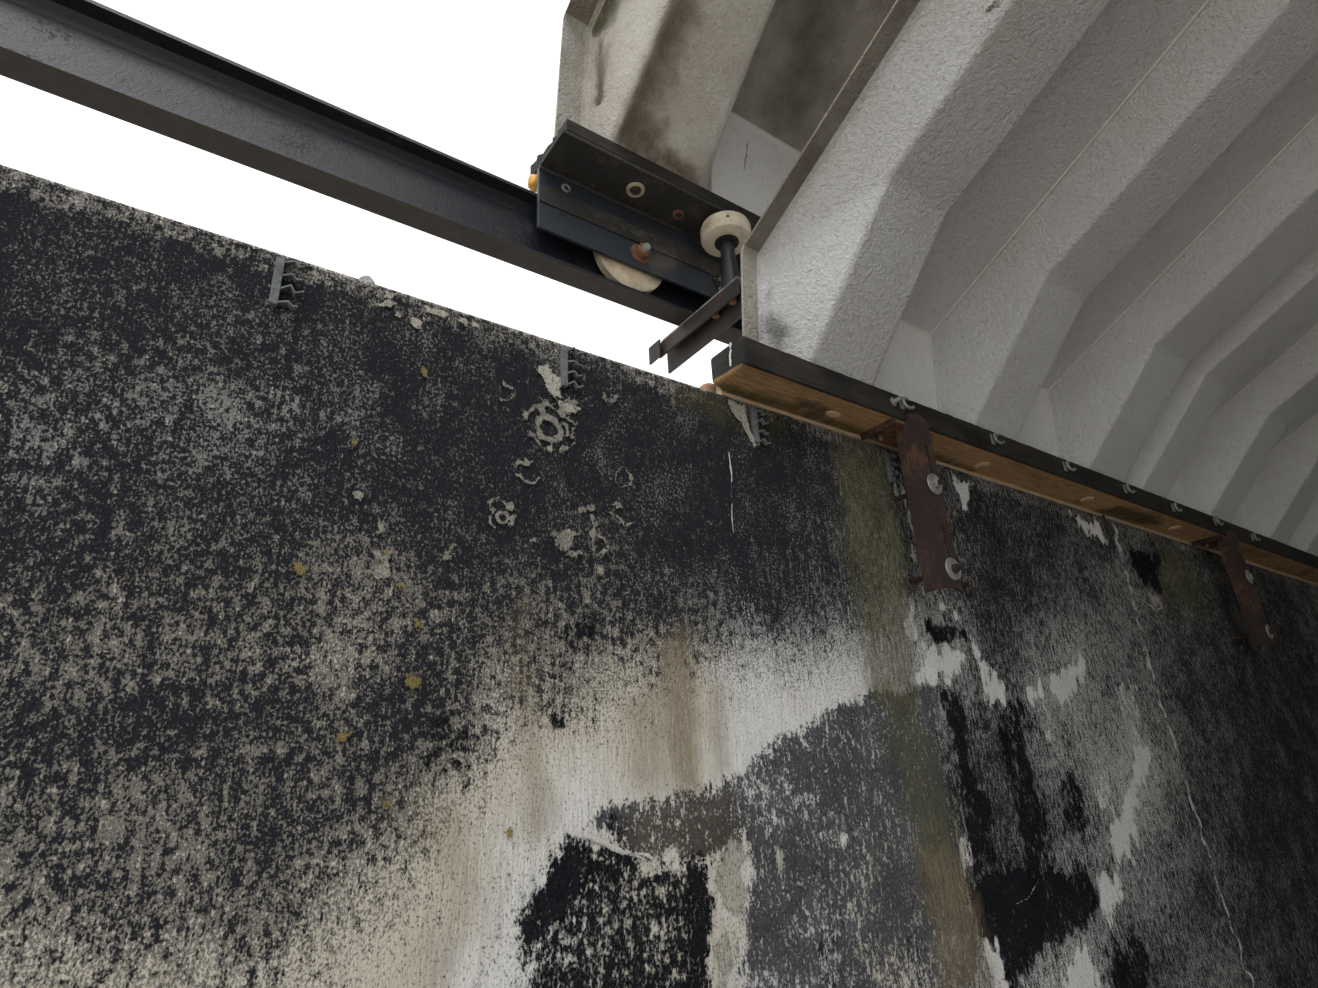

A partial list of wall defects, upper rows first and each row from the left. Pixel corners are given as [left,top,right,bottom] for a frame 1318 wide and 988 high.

water stain [631,0,692,115]
water stain [763,315,786,341]
water stain [1129,541,1163,609]
water stain [417,710,479,788]
water stain [511,464,1153,988]